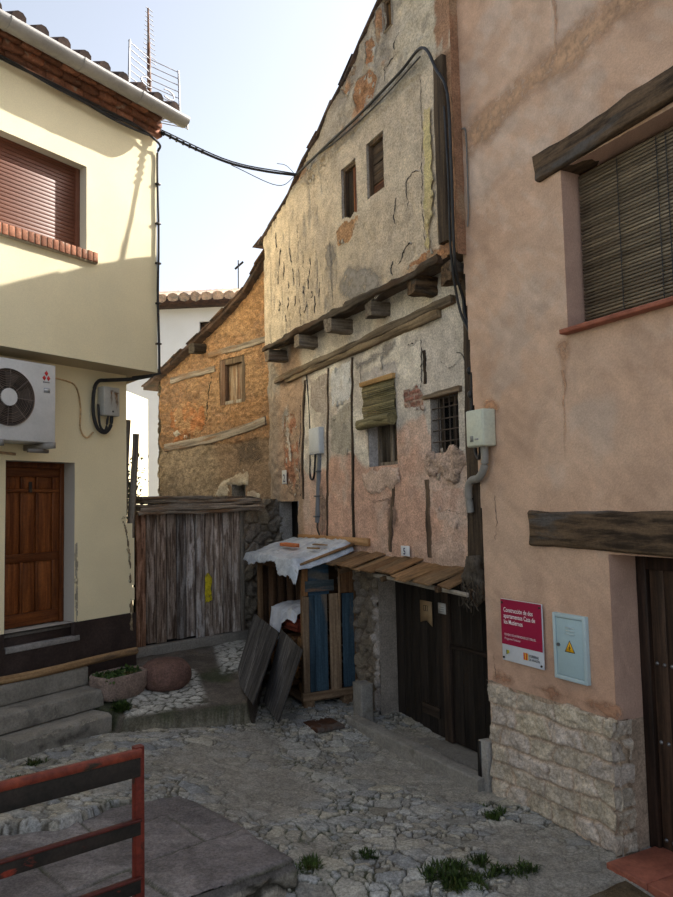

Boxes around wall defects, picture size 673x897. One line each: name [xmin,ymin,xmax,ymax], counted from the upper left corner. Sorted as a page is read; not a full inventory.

flaking render [340,5,387,121]
flaking render [335,212,361,250]
crack [390,72,426,275]
peeling [309,358,425,458]